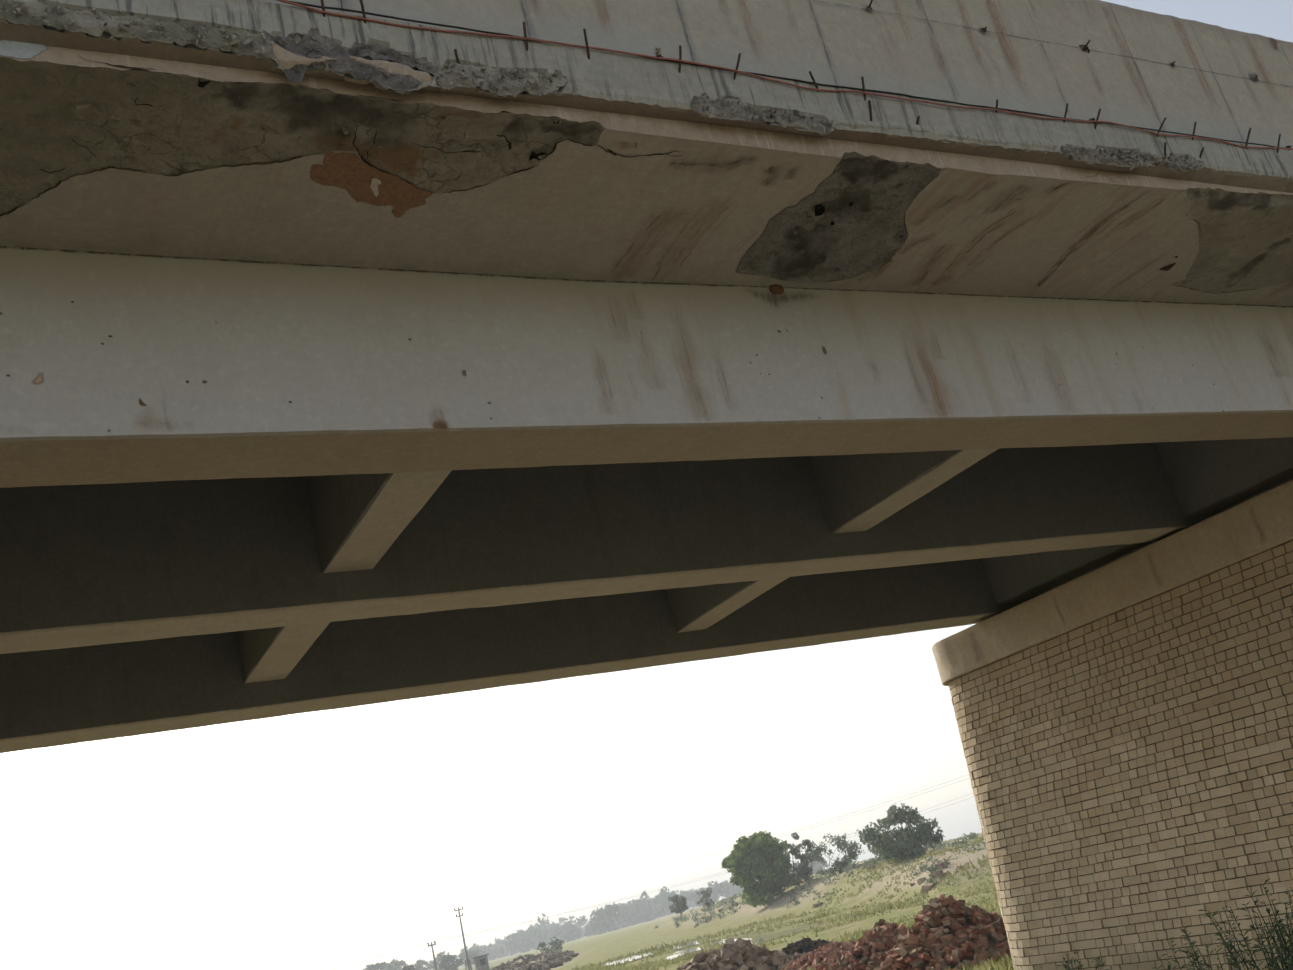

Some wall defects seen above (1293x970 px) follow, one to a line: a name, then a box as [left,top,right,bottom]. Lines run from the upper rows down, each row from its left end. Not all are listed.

spalling [0,0,606,218]
spalling [689,95,835,135]
spalling [735,152,948,282]
spalling [1061,117,1293,293]